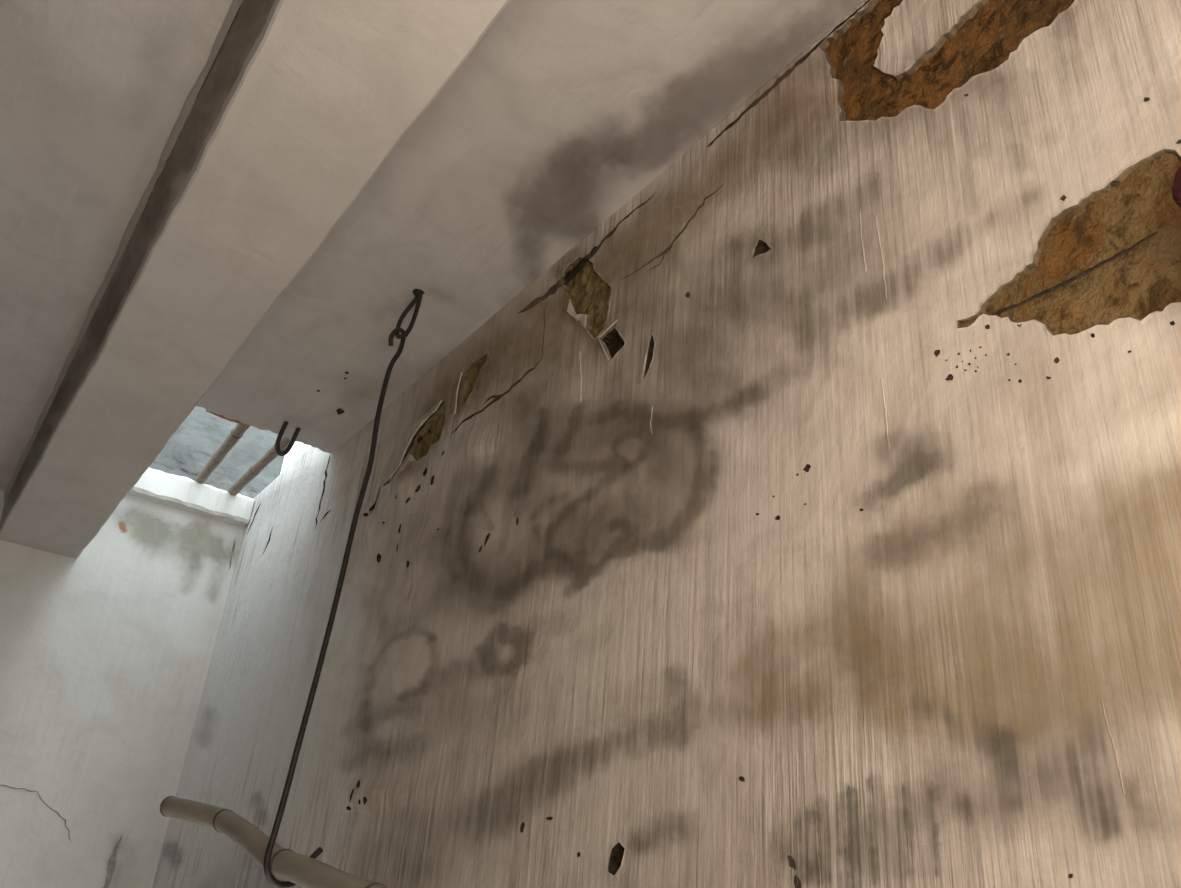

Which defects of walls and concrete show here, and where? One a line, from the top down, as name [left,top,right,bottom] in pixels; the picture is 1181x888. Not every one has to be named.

crack [707,0,870,147]
spalling [817,0,1084,124]
spalling [955,139,1181,341]
crack [451,193,655,434]
spalling [563,256,626,361]
spalling [934,346,987,381]
peeling [370,351,489,515]
water stain [594,406,699,487]
water stain [451,498,660,610]
crack [1,785,72,842]